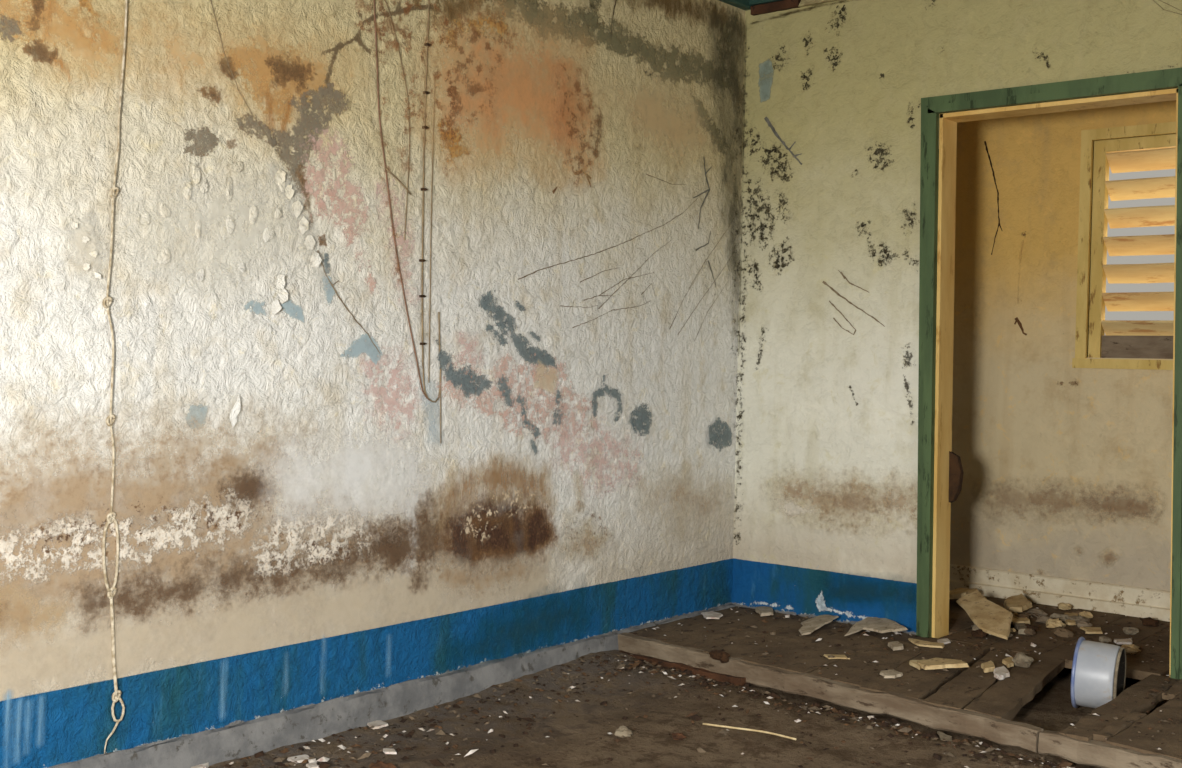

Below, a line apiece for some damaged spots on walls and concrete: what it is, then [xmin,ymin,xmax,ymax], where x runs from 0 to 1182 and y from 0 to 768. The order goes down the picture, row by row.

water stain [356,0,422,55]
water stain [803,33,843,71]
water stain [865,143,894,170]
peeling [183,82,379,305]
water stain [857,204,919,271]
peeling [244,274,305,323]
water stain [645,0,794,545]
peeling [436,290,652,484]
peeling [709,417,732,452]
water stain [778,478,917,519]
water stain [992,484,1152,517]
water stain [0,419,556,701]